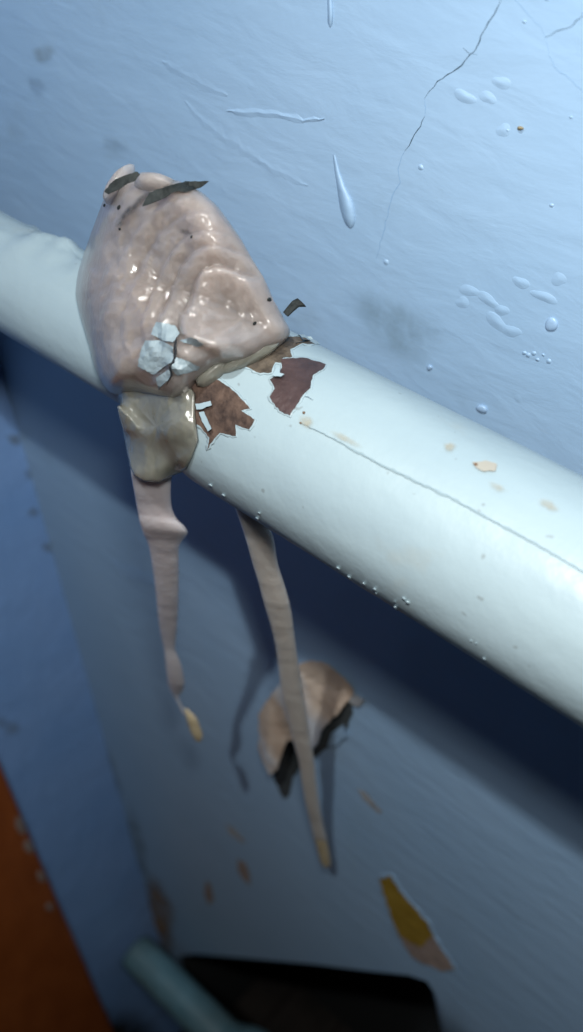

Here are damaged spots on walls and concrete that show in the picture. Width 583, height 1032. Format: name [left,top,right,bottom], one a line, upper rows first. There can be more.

crack [376,0,583,258]
peeling [138,322,257,451]
peeling [243,334,327,418]
flaking render [258,684,300,799]
flaking render [299,660,365,758]
peeling [377,873,456,972]